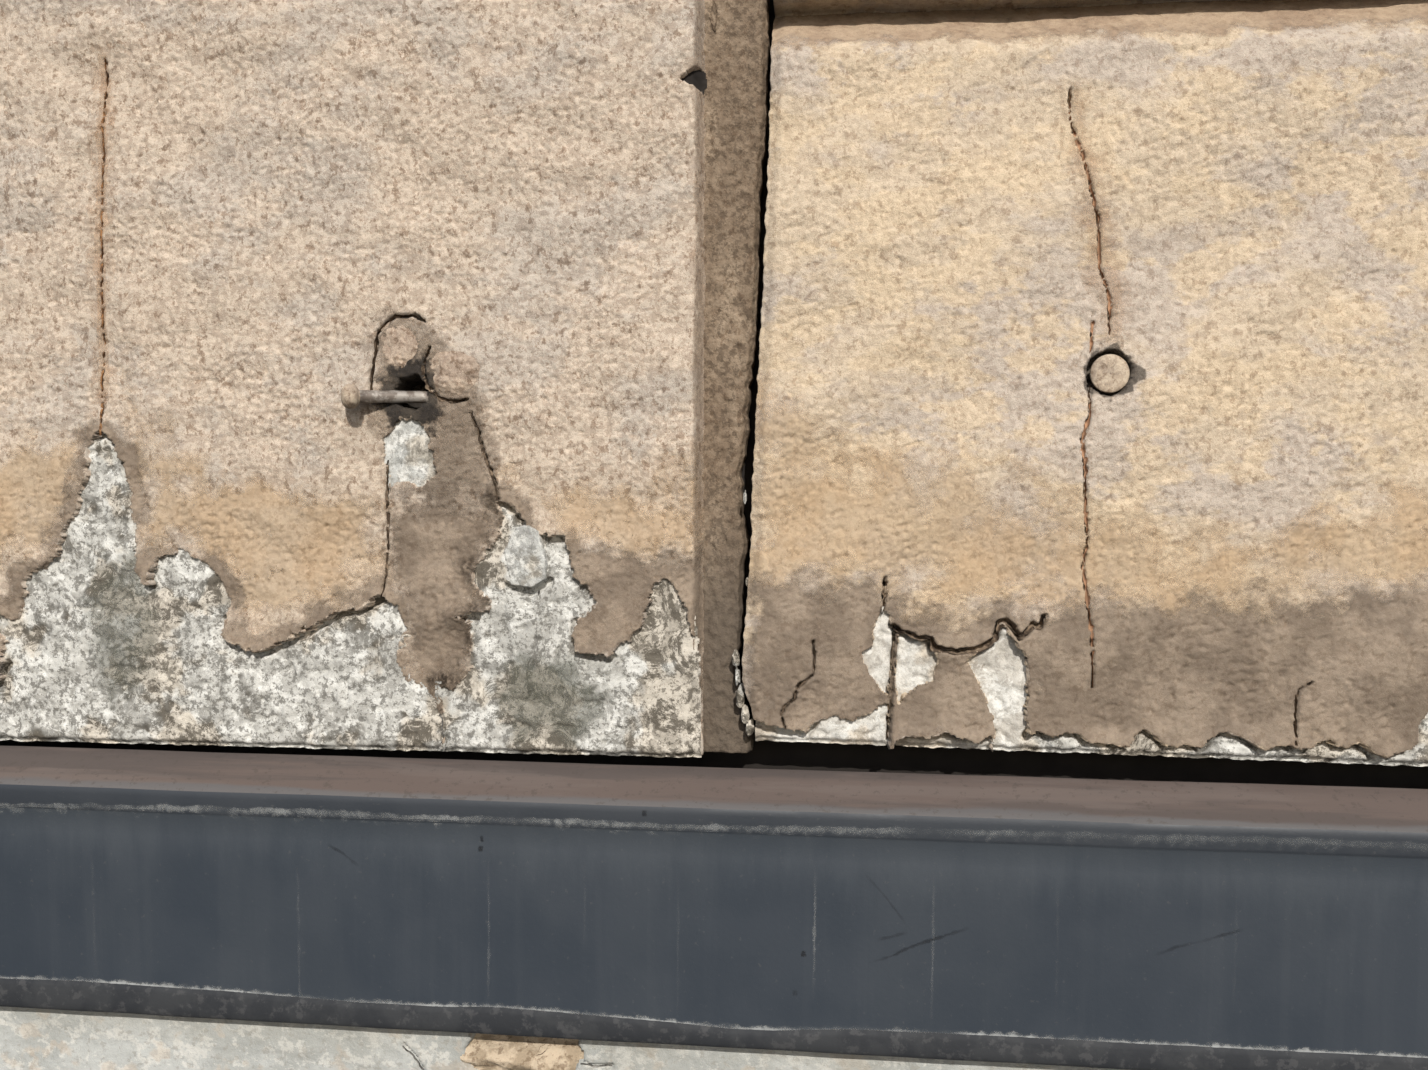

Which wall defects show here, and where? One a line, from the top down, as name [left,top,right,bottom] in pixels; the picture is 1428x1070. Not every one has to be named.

crack [99,58,109,435]
crack [1068,90,1113,352]
spalling [0,434,702,758]
crack [380,460,390,597]
spalling [383,419,437,490]
crack [370,314,499,500]
crack [780,645,816,728]
crack [881,581,1044,738]
spalling [731,607,1428,767]
crack [1080,386,1095,687]
crack [1294,682,1312,746]